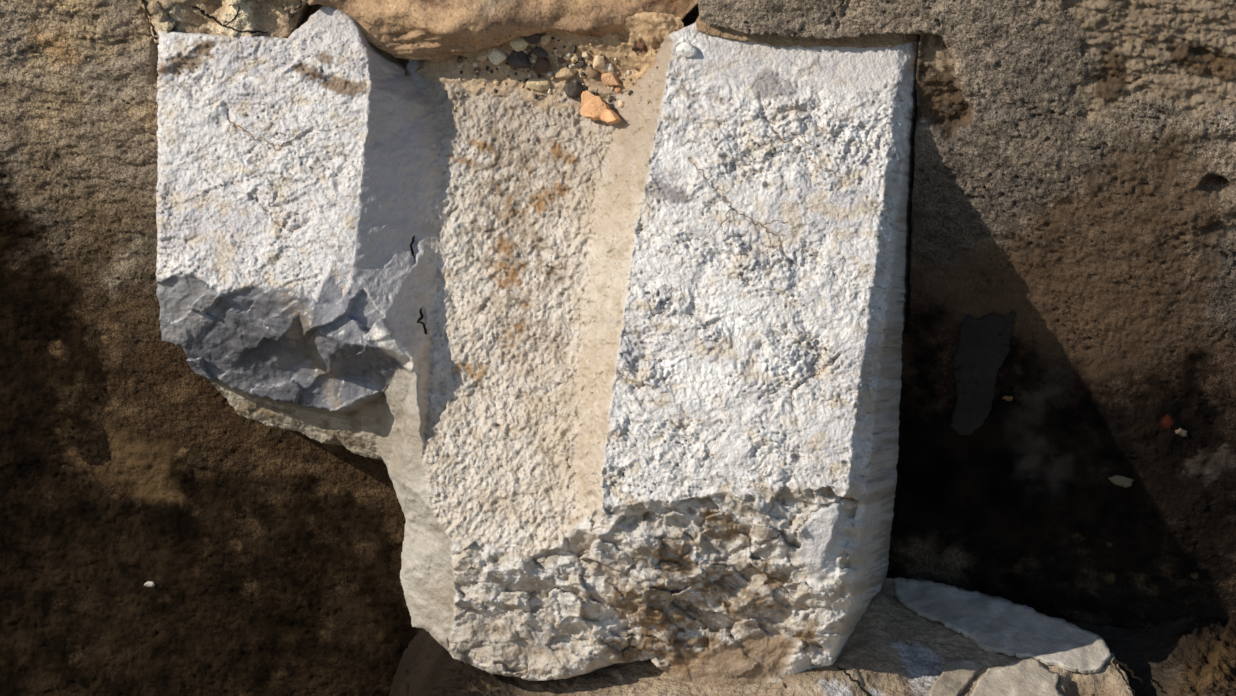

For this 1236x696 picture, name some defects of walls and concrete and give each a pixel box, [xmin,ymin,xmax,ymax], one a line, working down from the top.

crack [141,0,159,76]
crack [192,0,302,33]
spalling [156,270,420,414]
damp [0,175,418,696]
damp [888,307,1236,607]